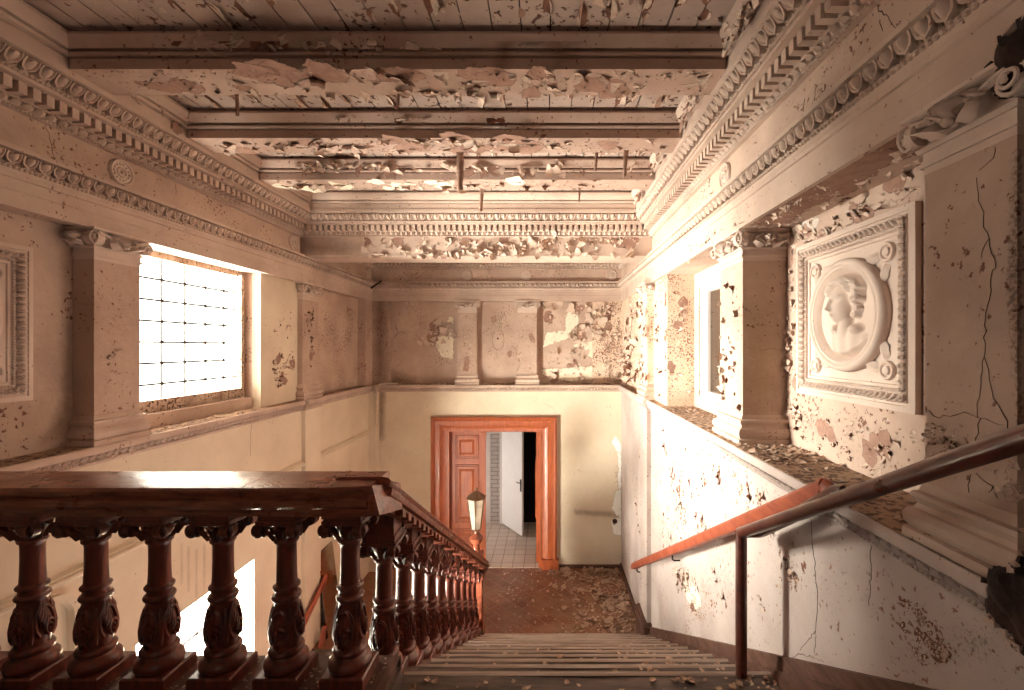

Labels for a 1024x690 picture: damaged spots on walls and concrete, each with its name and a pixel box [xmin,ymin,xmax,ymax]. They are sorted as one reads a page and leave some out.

peeling [85,0,713,212]
peeling [272,307,316,388]
peeling [417,309,475,373]
peeling [358,231,639,260]
peeling [488,291,690,396]
peeling [686,138,957,476]
crack [927,149,1009,441]
peeling [657,426,763,548]
peeling [672,565,729,621]
crack [794,523,818,659]
peeling [898,596,952,667]
spalling [980,551,1024,656]